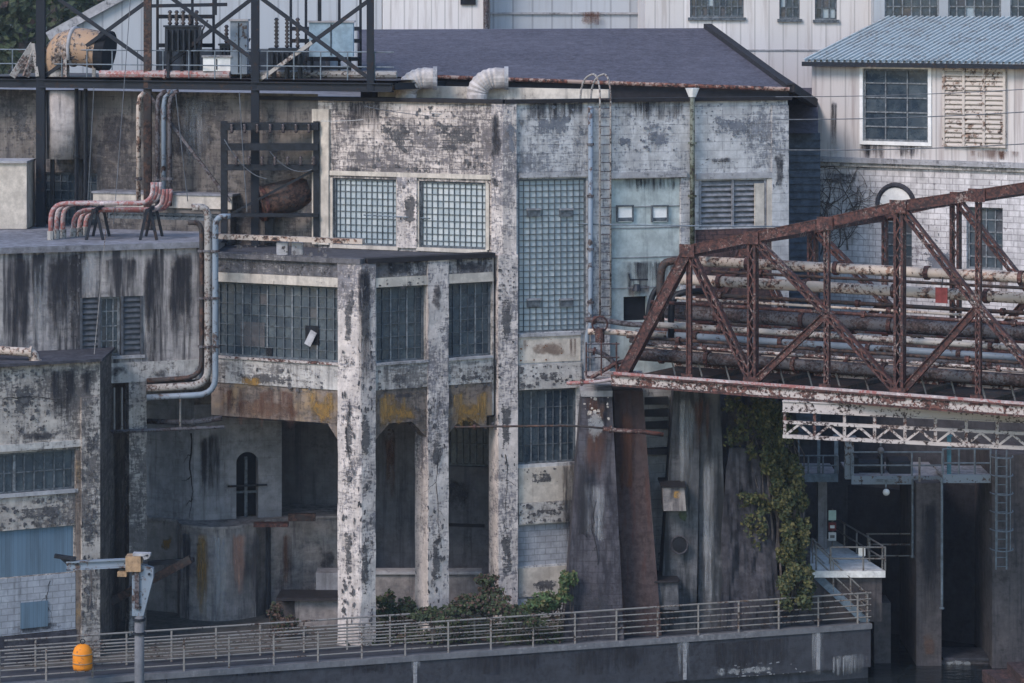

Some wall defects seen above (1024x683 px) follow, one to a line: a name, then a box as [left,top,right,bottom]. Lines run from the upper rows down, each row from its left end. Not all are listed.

peeling [697,103,770,145]
peeling [368,104,501,242]
leakage [13,254,81,339]
leakage [146,256,192,324]
leakage [24,370,91,440]
crack [182,433,193,518]
peeling [218,244,577,626]